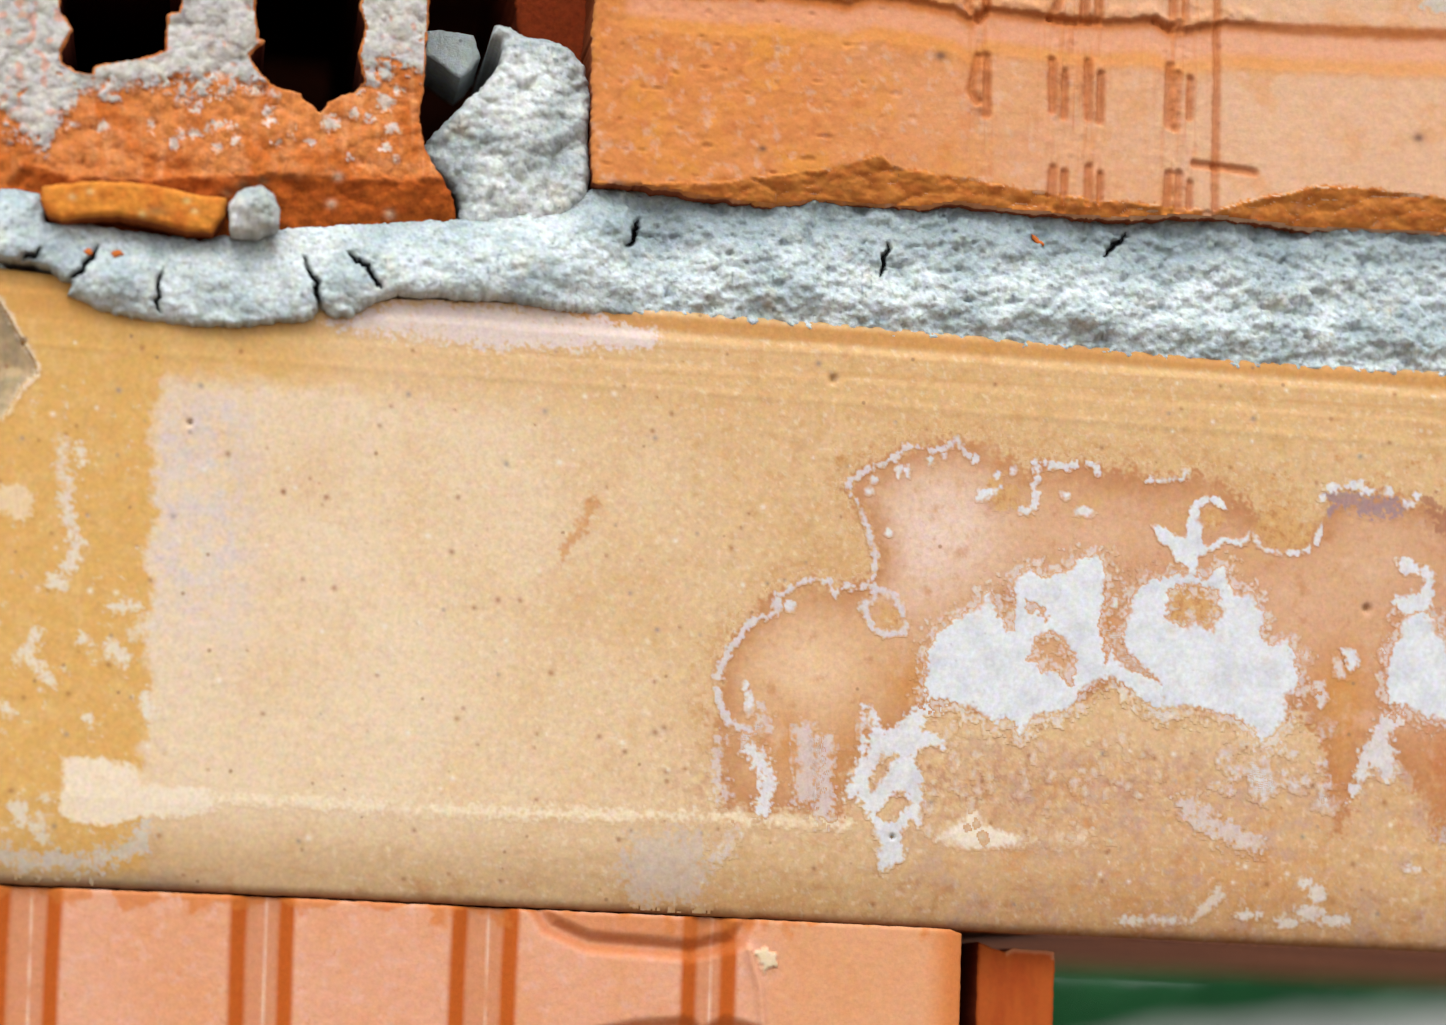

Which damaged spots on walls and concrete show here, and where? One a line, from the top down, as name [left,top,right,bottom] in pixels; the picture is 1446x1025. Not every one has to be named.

water stain [600,403,1446,914]